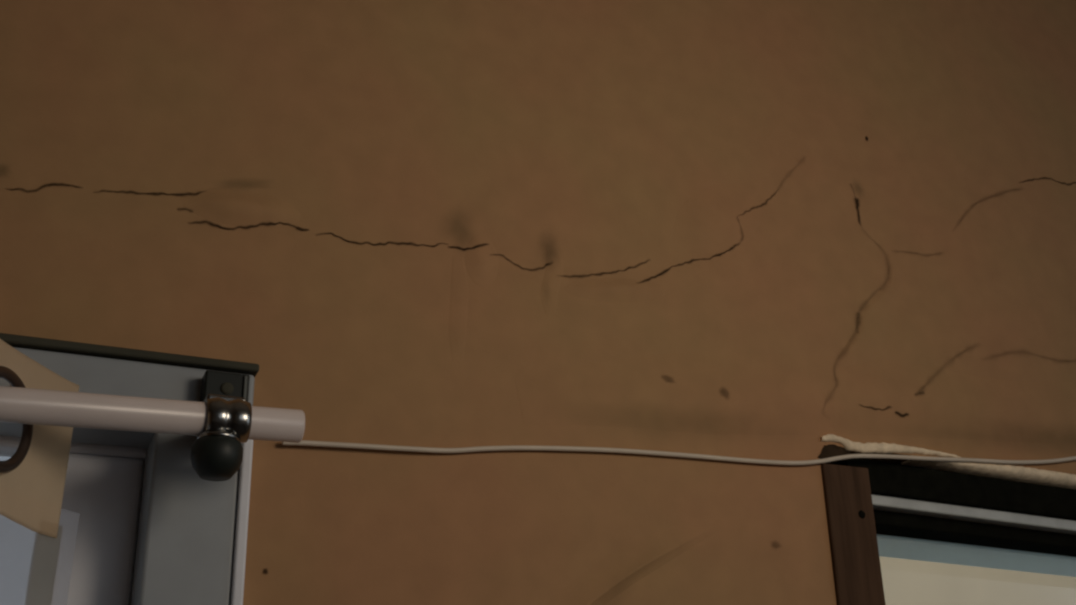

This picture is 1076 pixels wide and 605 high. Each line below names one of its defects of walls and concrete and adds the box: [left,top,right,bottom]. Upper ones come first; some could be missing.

crack [10,183,201,196]
crack [194,221,736,282]